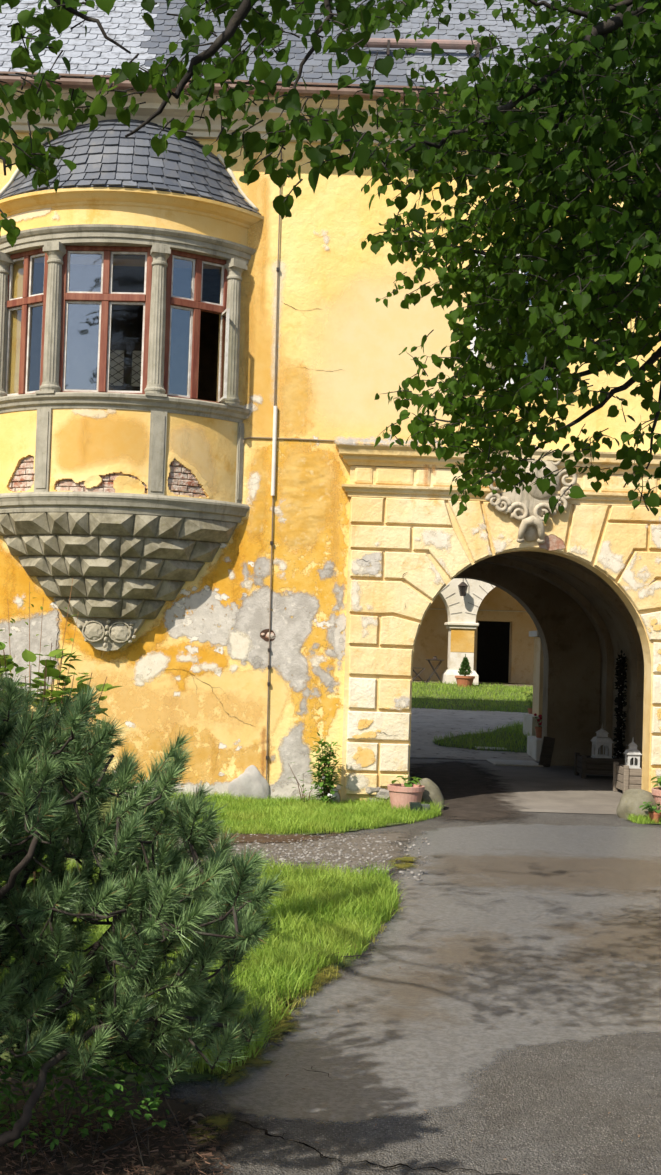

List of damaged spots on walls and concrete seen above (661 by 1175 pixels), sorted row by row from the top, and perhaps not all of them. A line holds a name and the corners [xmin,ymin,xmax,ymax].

flaking render [8,456,35,492]
flaking render [55,472,147,493]
flaking render [167,458,207,497]
peeling [538,517,661,598]
flaking render [0,596,63,698]
flaking render [135,542,382,803]